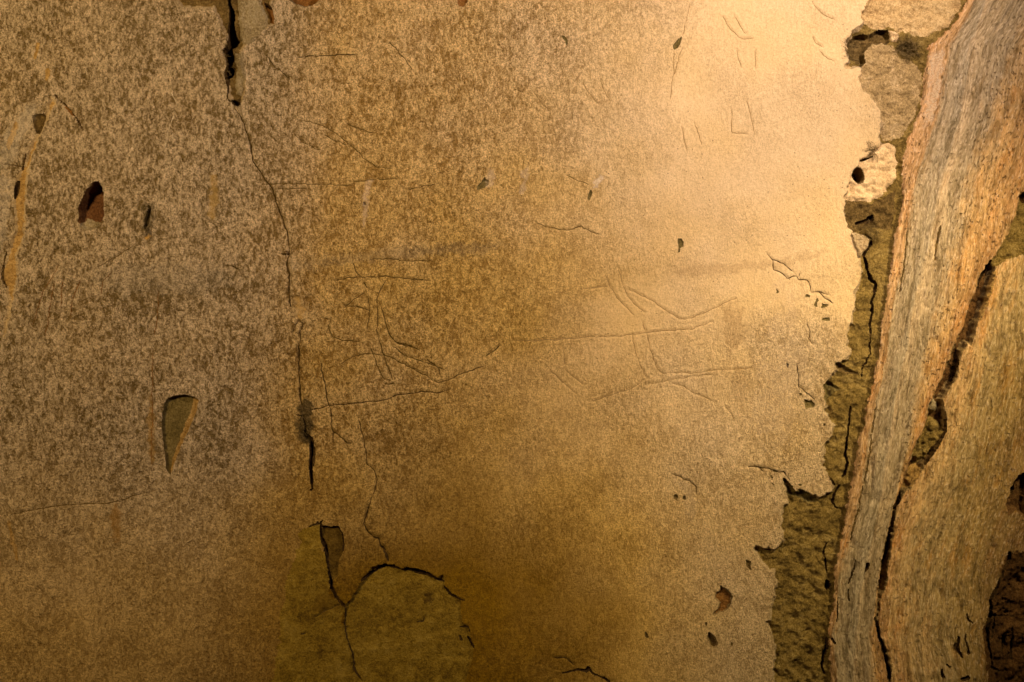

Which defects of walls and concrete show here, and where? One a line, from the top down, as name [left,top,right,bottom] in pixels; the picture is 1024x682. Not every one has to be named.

flaking render [986,200,1024,268]
crack [223,0,446,561]
crack [770,257,832,303]
flaking render [746,0,967,682]
flaking render [161,394,199,475]
crack [301,605,362,680]
flaking render [271,520,475,682]
flaking render [705,586,733,648]
spalling [953,613,973,658]